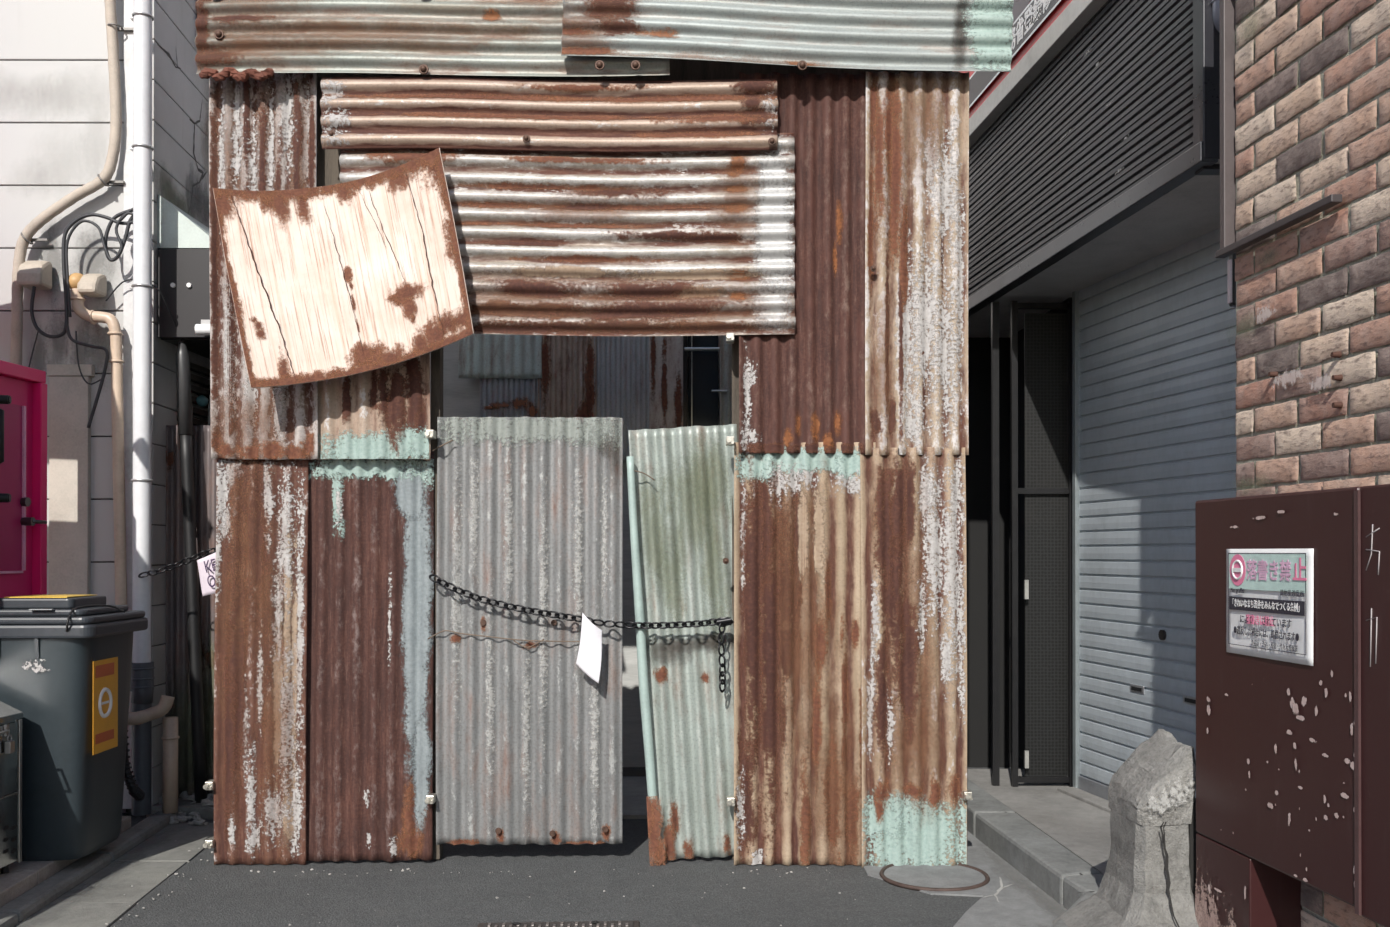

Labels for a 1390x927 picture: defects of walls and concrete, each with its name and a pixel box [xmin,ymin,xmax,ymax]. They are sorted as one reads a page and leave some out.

corrosion [195,0,788,858]
corrosion [646,796,693,866]
corrosion [724,73,961,865]
crack [1160,822,1180,927]